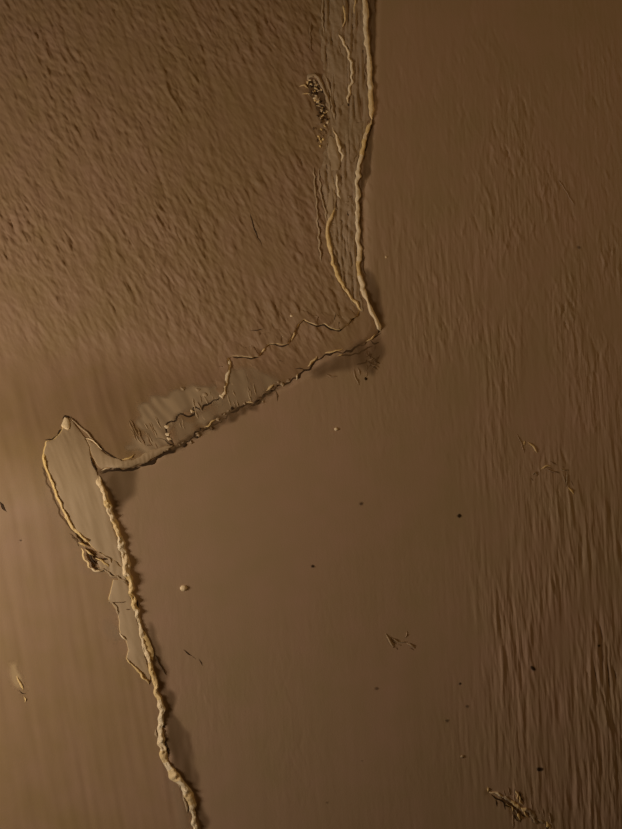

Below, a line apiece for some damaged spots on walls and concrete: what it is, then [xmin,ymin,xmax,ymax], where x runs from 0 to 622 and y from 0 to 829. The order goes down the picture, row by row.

peeling [299,0,370,312]
peeling [42,360,276,684]
spalling [487,787,551,829]